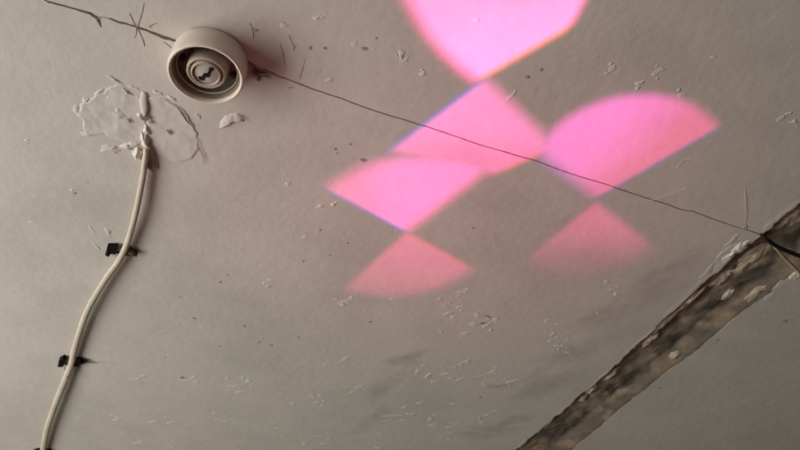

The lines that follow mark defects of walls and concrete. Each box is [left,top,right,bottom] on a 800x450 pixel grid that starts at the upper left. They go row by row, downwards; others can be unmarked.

crack [44,0,176,48]
flaking render [72,75,205,172]
crack [248,61,760,235]
flaking render [516,198,800,450]